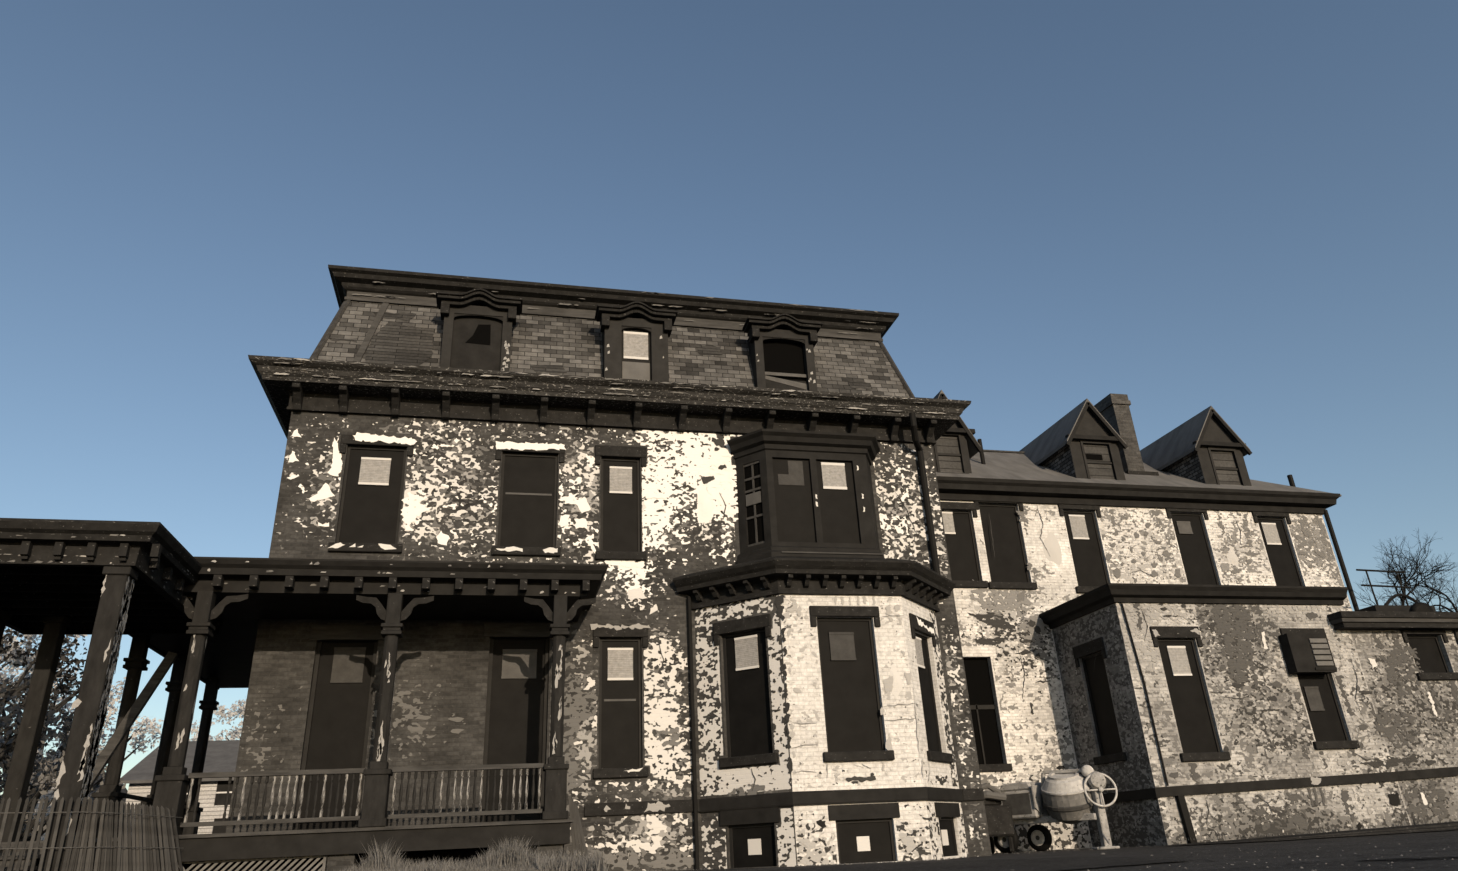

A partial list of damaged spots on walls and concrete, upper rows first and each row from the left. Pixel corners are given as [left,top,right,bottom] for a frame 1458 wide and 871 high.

peeling [873,443,948,576]
peeling [1098,510,1185,584]
peeling [1215,519,1267,585]
peeling [1289,515,1341,587]
peeling [239,686,303,787]
peeling [276,414,737,871]
peeling [757,595,876,786]
peeling [896,563,1458,862]
spalling [778,808,837,866]